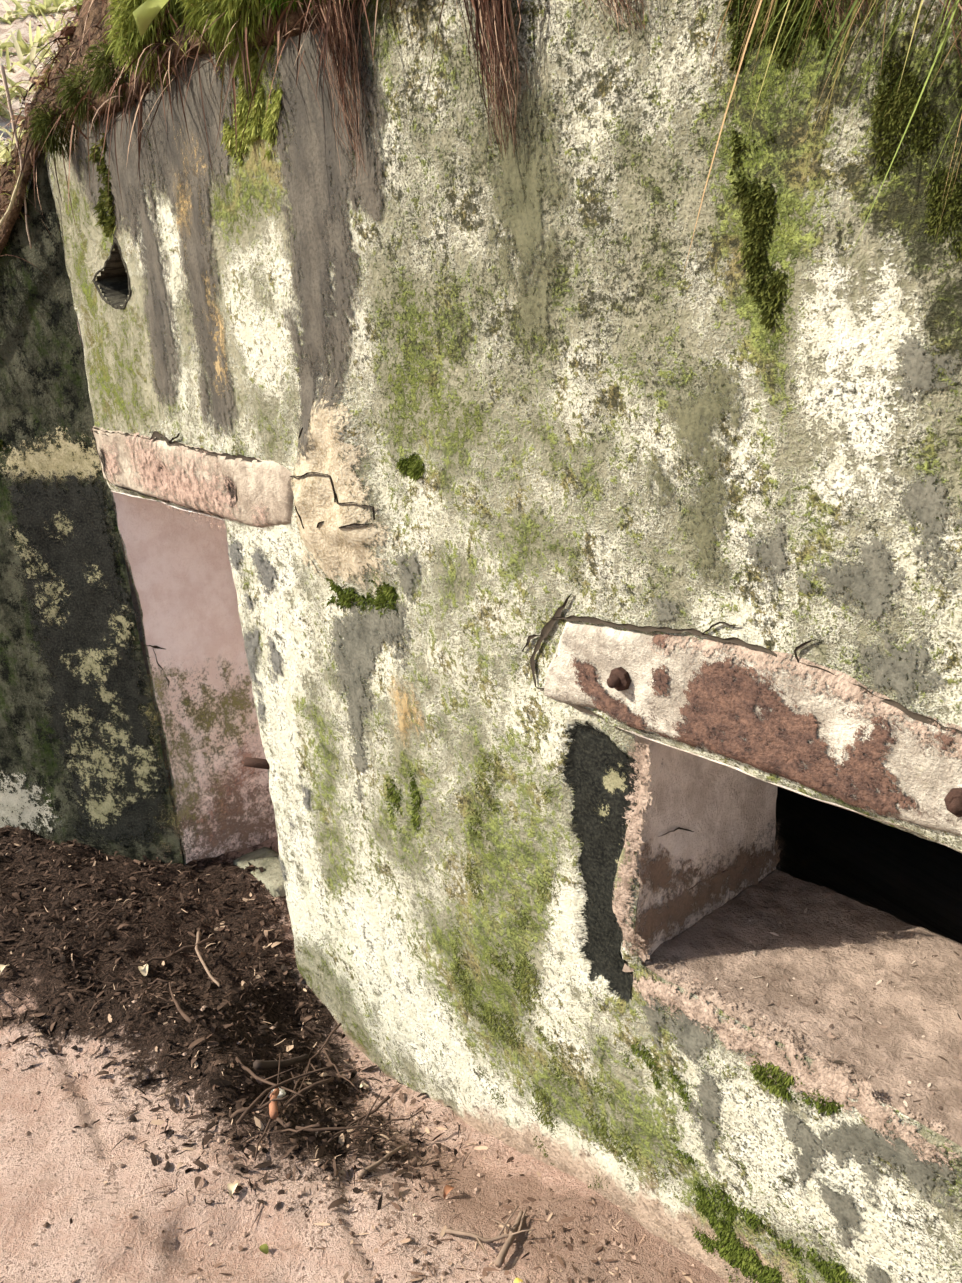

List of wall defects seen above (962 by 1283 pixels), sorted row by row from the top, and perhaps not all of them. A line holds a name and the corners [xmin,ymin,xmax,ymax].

leakage [71,47,240,438]
leakage [263,0,384,465]
corrosion [571,652,917,821]
corrosion [934,729,956,756]